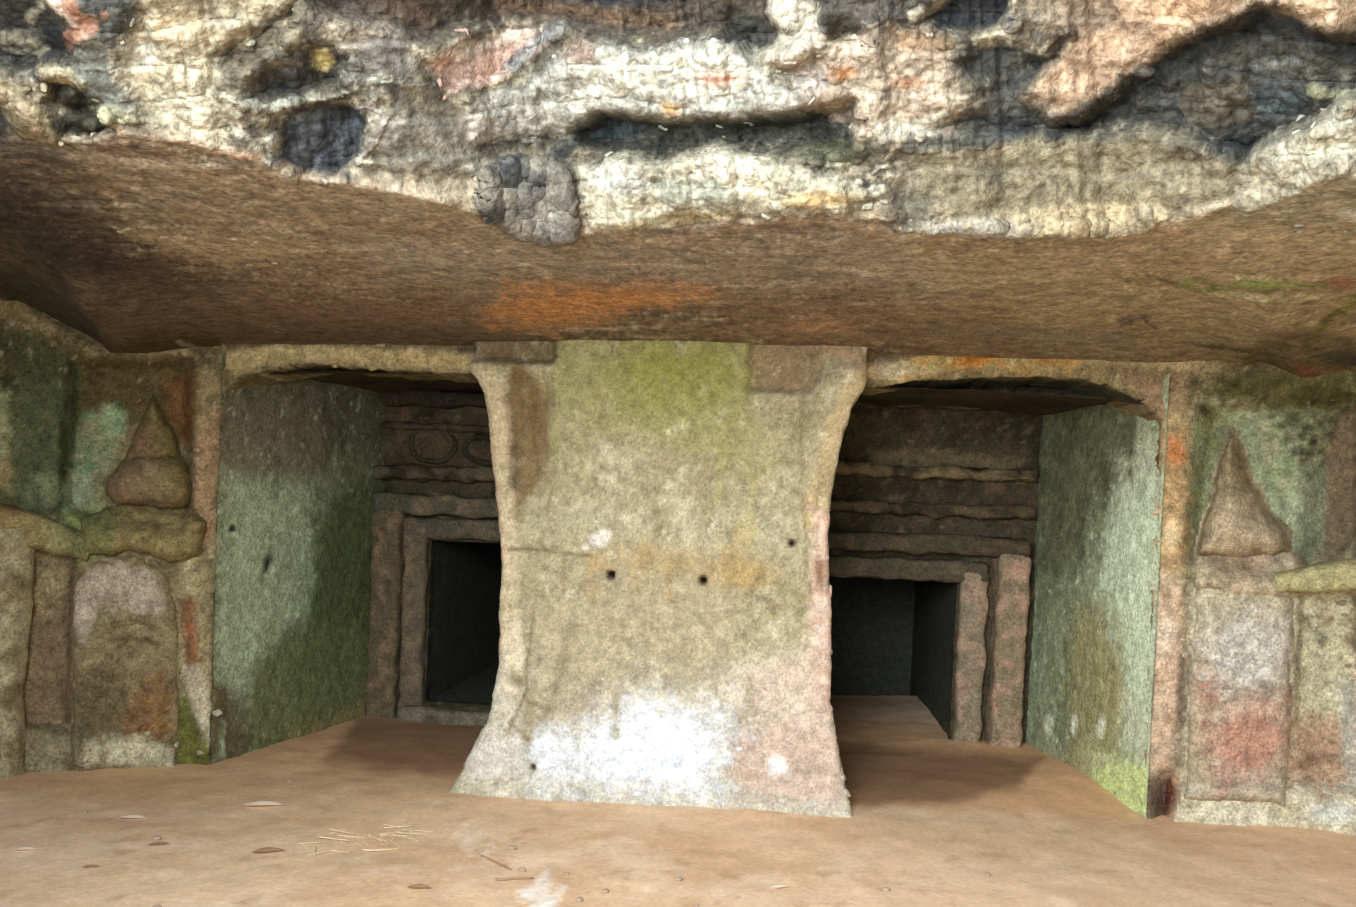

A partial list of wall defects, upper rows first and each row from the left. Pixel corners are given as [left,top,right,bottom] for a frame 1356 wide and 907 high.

water stain [501,357,565,523]
water stain [615,340,755,403]
water stain [70,528,370,770]